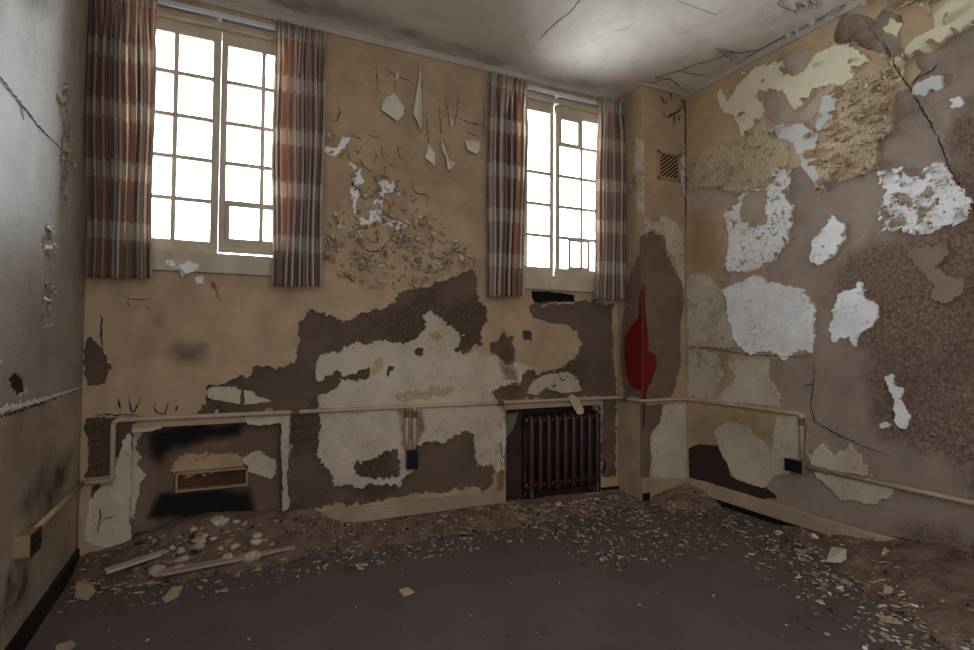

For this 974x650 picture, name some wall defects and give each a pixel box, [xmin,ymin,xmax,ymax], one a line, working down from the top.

crack [0,77,62,150]
crack [649,4,974,228]
flaking render [166,0,974,557]
flaking render [9,374,24,396]
crack [0,387,82,417]
peeling [83,416,162,548]